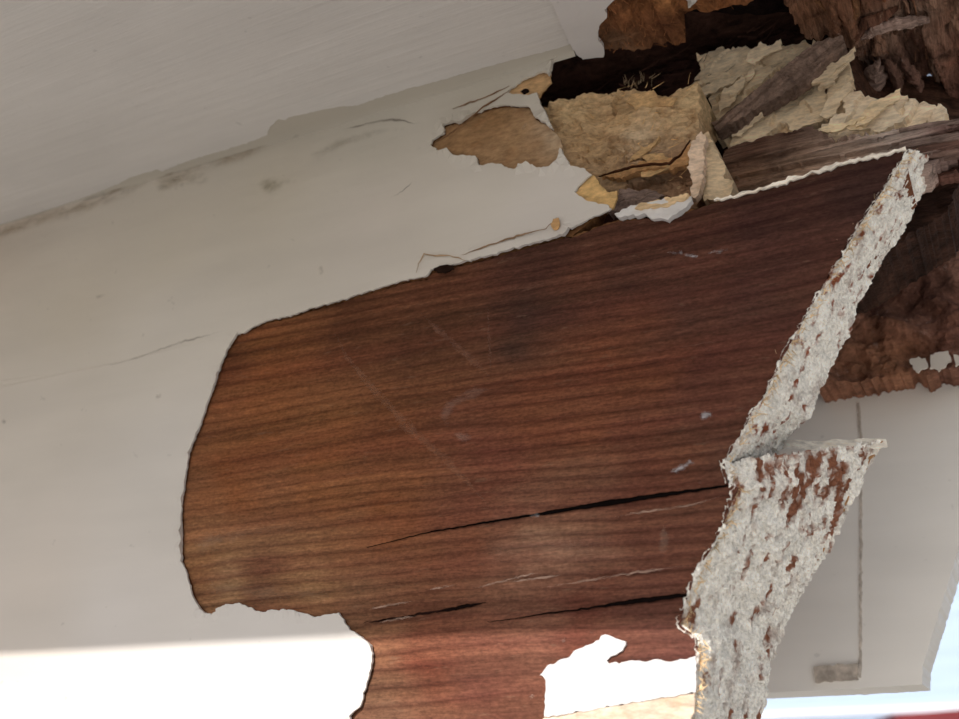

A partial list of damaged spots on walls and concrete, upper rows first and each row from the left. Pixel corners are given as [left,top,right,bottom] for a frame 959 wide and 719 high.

spalling [688,0,789,15]
peeling [509,73,552,99]
peeling [626,90,677,110]
peeling [693,39,816,121]
peeling [811,47,949,142]
peeling [909,351,959,374]
peeling [183,107,909,719]
crack [367,484,728,548]
crack [364,593,687,623]